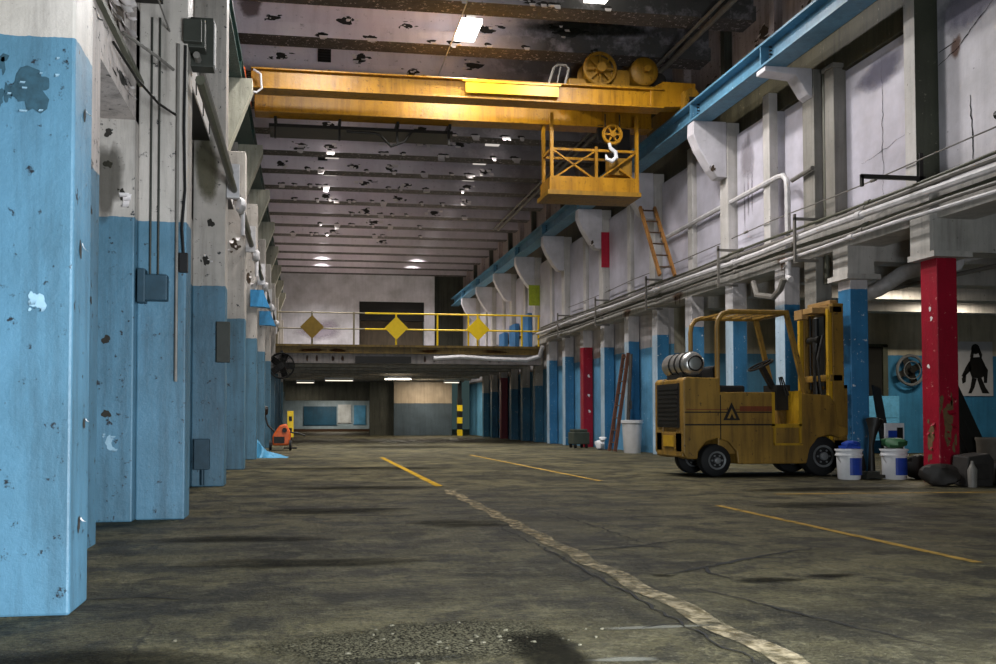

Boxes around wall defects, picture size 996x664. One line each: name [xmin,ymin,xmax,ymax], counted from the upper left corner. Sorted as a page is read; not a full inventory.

peeling [0,53,60,114]
crack [500,503,941,664]